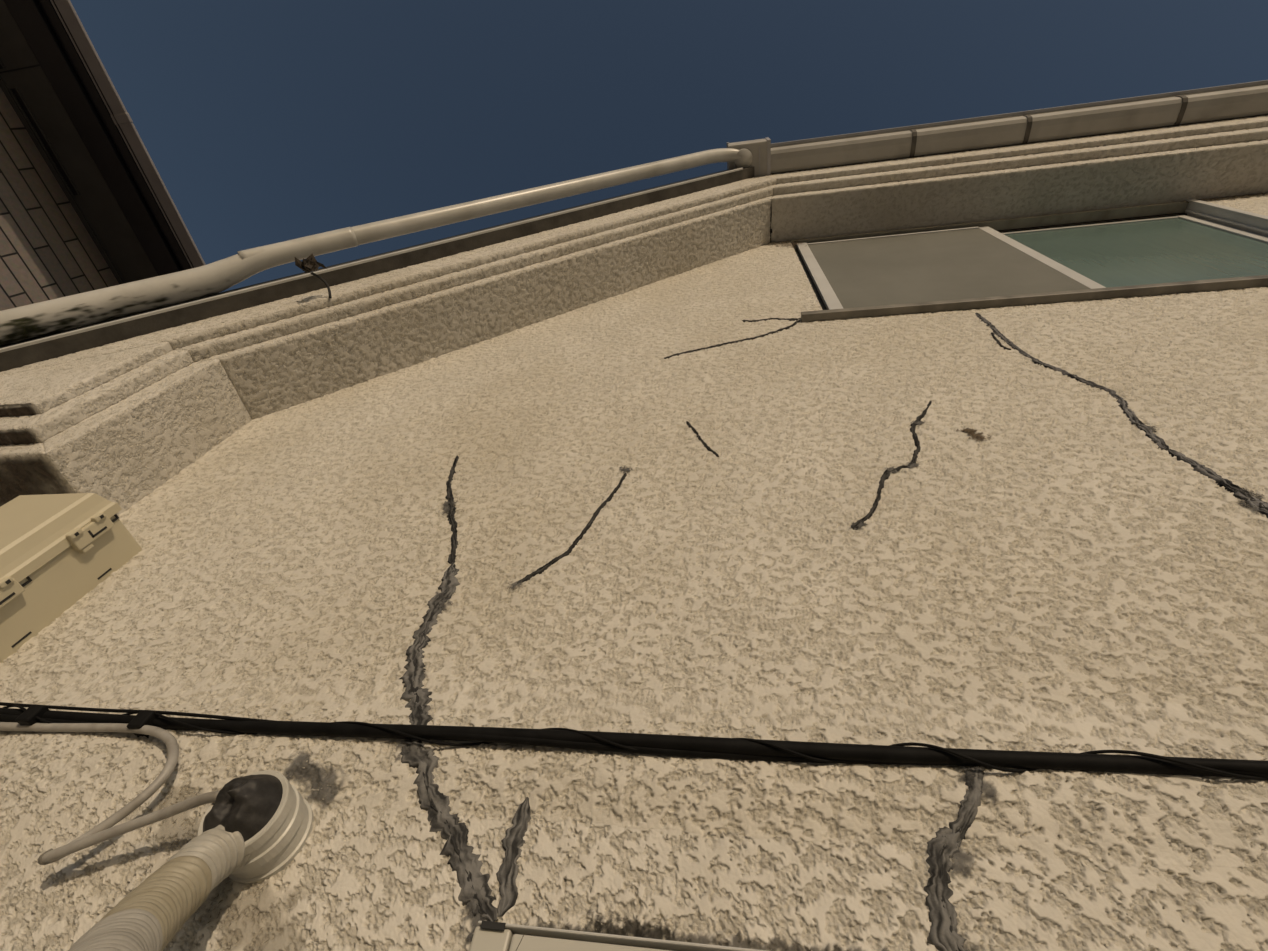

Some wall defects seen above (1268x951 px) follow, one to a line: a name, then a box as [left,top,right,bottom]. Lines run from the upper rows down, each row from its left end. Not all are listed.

crack [664,318,801,359]
crack [510,465,632,590]
crack [686,421,719,457]
crack [849,401,932,530]
crack [975,313,1268,518]
crack [396,456,531,942]
crack [924,766,997,951]